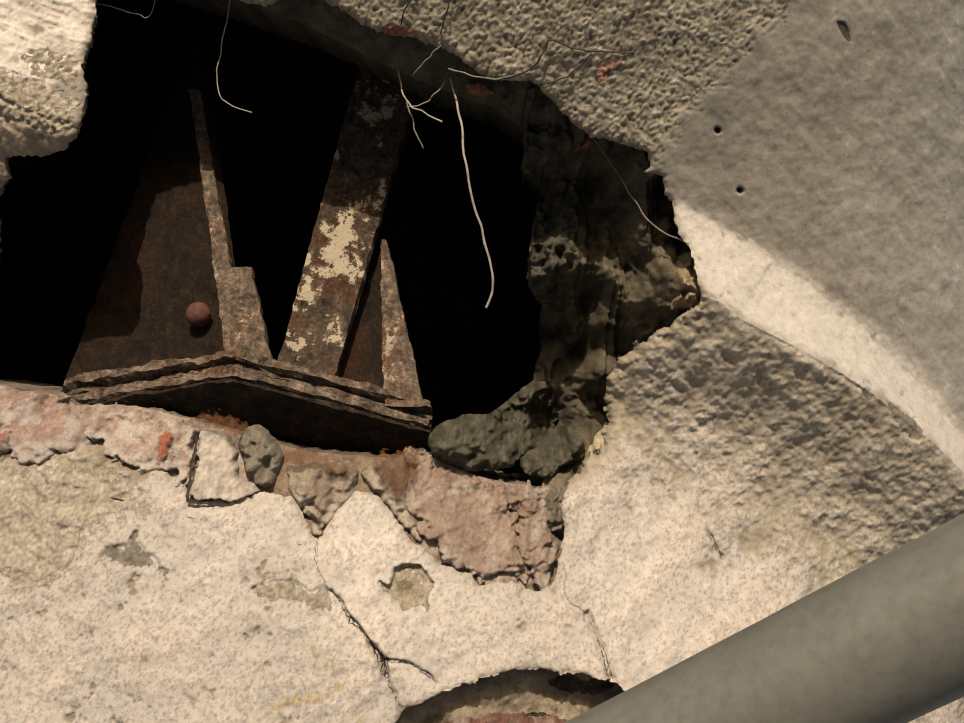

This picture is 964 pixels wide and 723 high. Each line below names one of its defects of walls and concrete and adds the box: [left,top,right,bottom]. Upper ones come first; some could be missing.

spalling [0,0,701,504]
rust [156,431,179,465]
crack [186,430,254,507]
rust [195,415,247,437]
rust [64,350,433,433]
peeling [0,439,150,588]
spalling [105,533,169,576]
crack [314,538,437,712]
spalling [381,563,434,611]
spalling [388,508,540,591]
spalling [550,512,564,584]
flaking render [395,668,624,723]